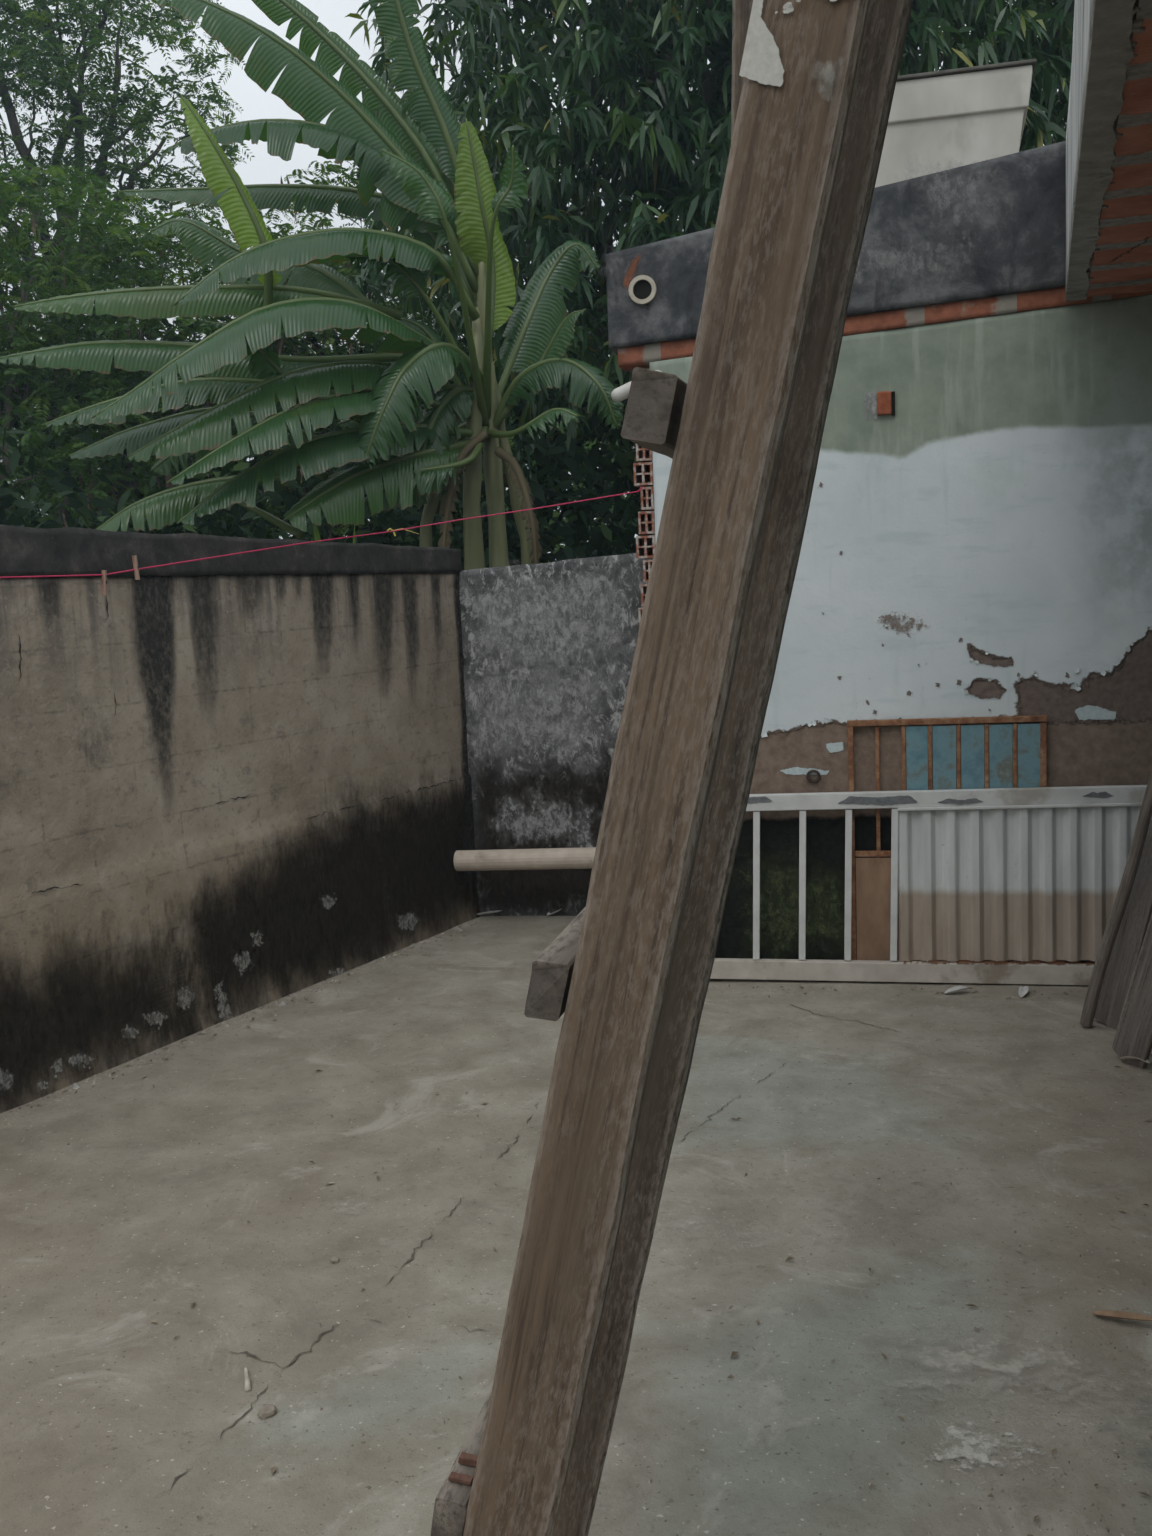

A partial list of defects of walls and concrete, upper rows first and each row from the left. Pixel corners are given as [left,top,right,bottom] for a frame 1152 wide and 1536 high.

leakage [0,569,622,1111]
peeling [879,614,927,647]
peeling [744,627,1152,821]
crack [108,1099,541,1529]